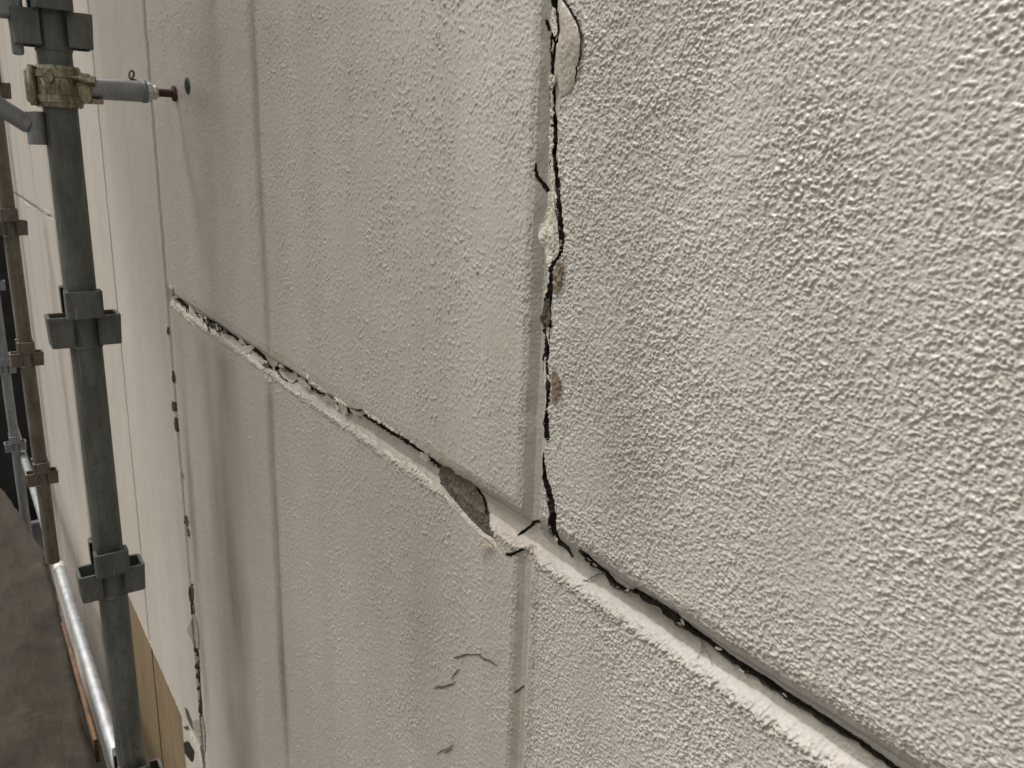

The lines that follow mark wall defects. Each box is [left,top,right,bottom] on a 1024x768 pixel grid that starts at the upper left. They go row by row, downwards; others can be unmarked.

crack [172,292,443,468]
peeling [168,284,502,554]
crack [506,0,900,768]
crack [194,646,203,718]
crack [433,654,498,689]